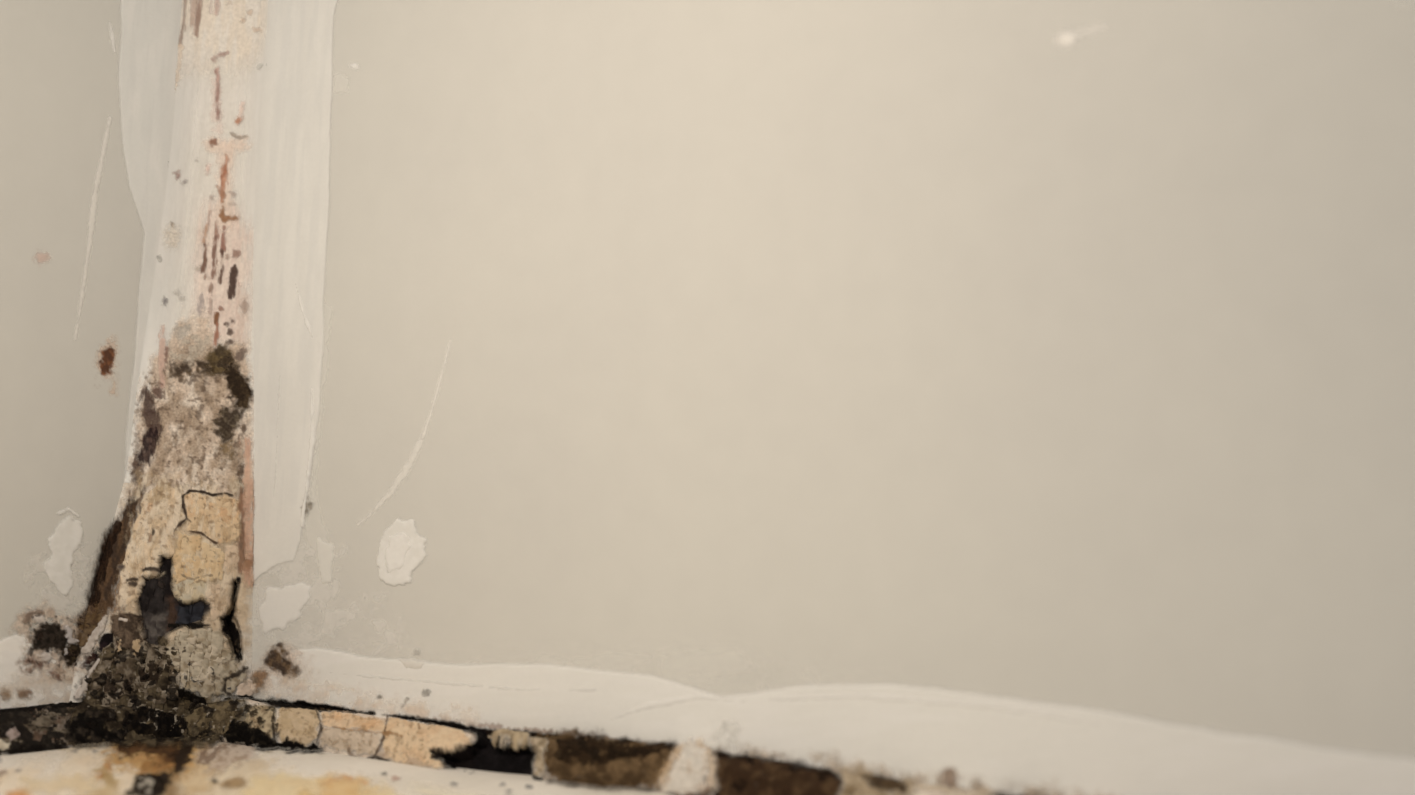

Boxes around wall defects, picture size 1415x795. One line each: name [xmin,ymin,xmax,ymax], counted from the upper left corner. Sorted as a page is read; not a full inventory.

corrosion [176,0,268,348]
corrosion [99,341,116,375]
damp [73,291,254,632]
crack [149,480,242,662]
peeling [38,473,549,781]
peeling [0,727,20,751]
damp [0,746,139,795]
damp [176,642,478,795]
crack [243,697,585,762]
damp [500,728,678,795]
peeling [660,738,715,795]
damp [709,721,1062,795]